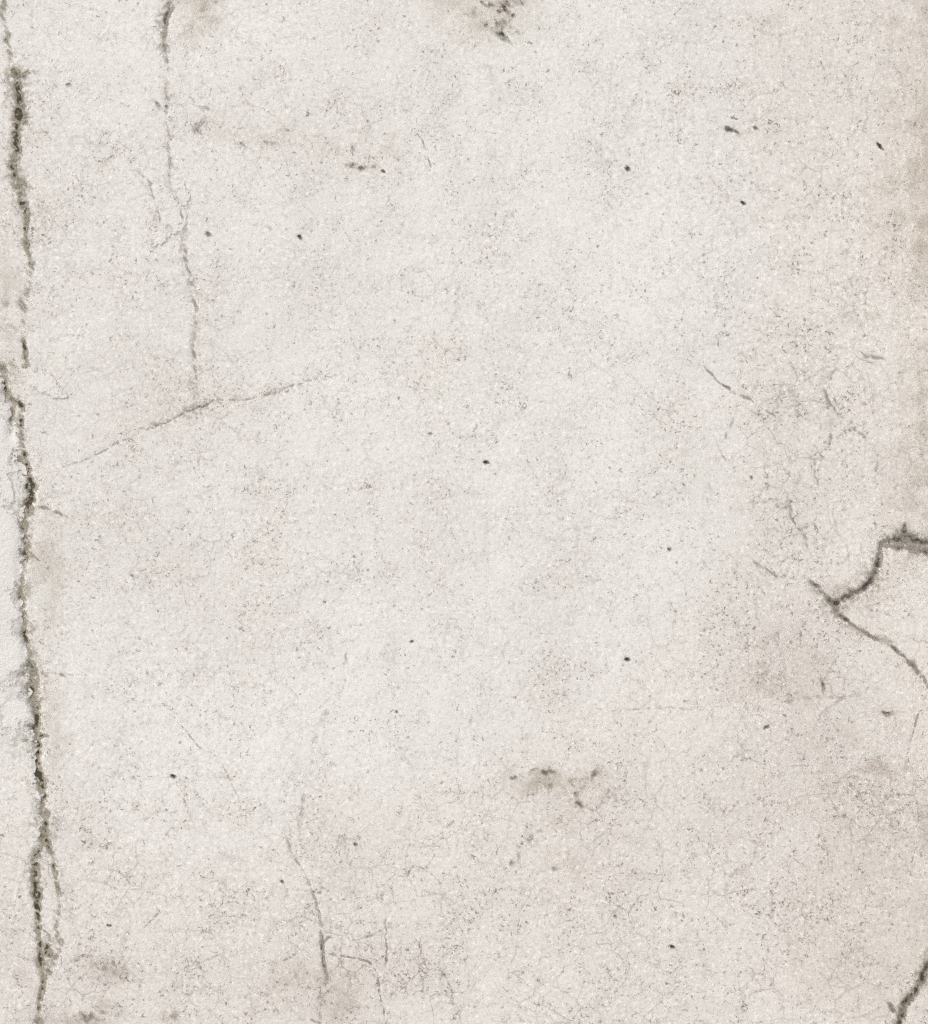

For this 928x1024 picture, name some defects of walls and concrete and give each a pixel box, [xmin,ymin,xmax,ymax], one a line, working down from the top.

crack [147,0,208,175]
crack [150,380,306,428]
crack [0,0,68,1024]
crack [809,523,928,686]
crack [888,955,928,1024]